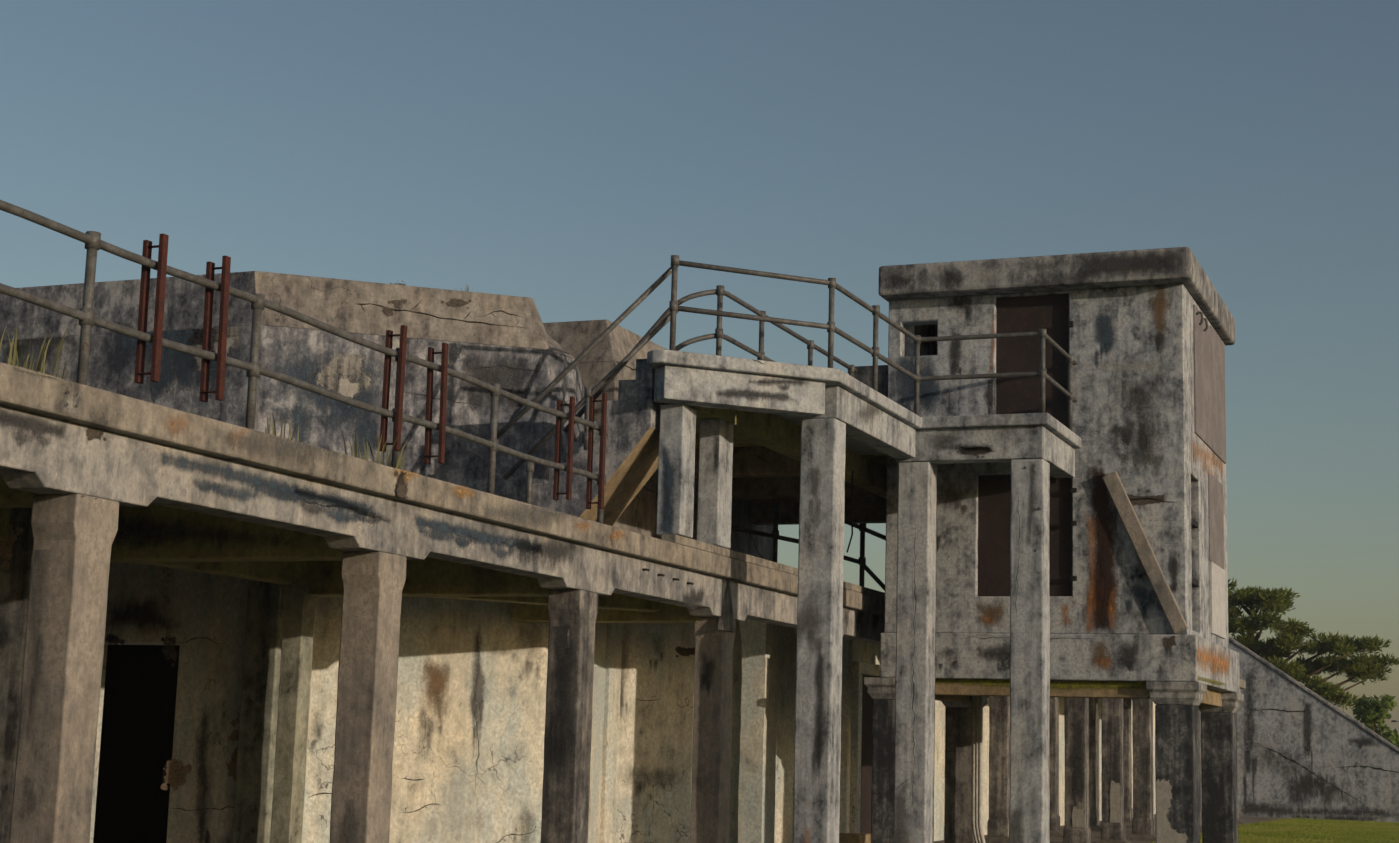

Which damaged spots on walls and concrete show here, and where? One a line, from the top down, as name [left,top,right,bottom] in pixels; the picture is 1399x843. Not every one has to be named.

crack [358,300,524,328]
corrosion [1088,467,1120,668]
leakage [421,664,448,728]
leakage [471,631,485,743]
leakage [197,716,210,843]
peeling [1156,778,1189,843]